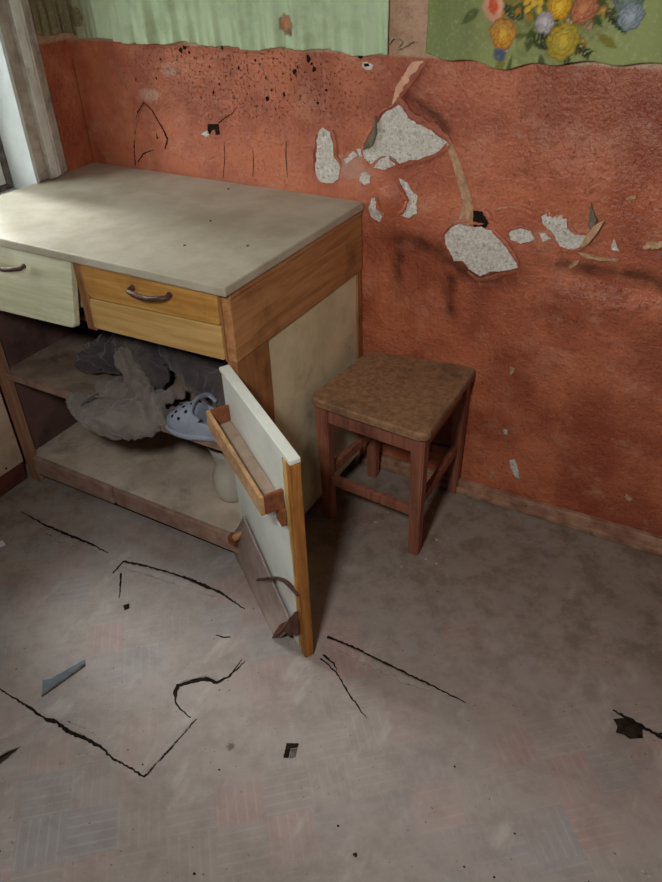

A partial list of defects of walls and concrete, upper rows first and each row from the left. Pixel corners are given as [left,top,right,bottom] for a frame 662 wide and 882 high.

crack [132,102,168,166]
flaking render [312,97,453,218]
flaking render [368,198,385,222]
flaking render [443,208,586,282]
peeling [642,241,662,257]
crack [21,511,245,609]
crack [0,659,245,777]
crack [320,636,466,719]